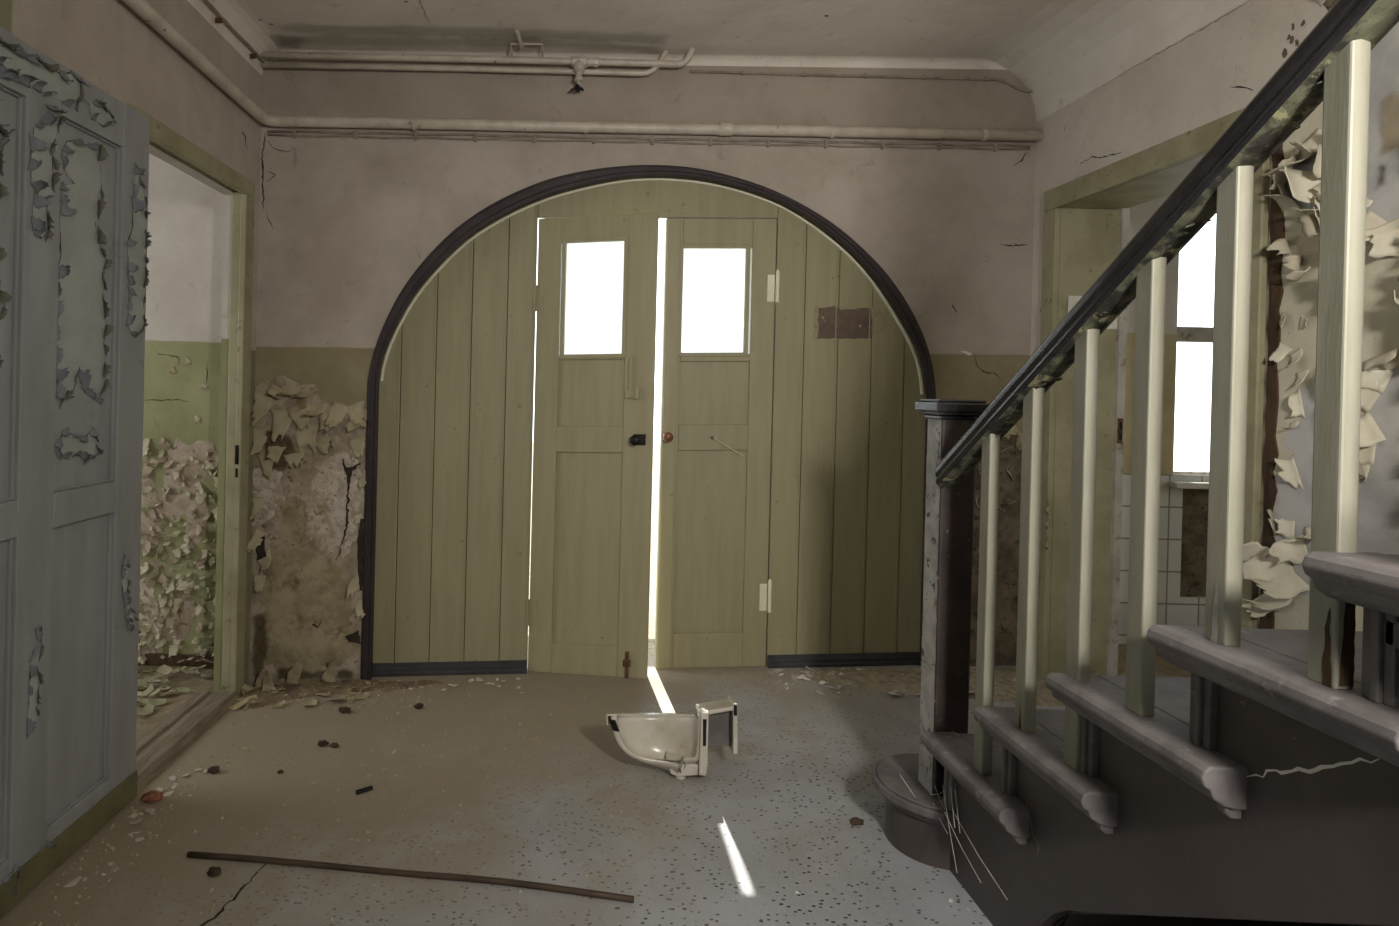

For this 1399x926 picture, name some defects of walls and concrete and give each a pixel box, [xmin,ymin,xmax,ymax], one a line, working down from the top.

peeling [0,36,152,409]
peeling [1260,125,1322,238]
peeling [1266,239,1318,281]
peeling [1282,19,1305,58]
peeling [1365,22,1399,258]
peeling [121,437,218,665]
peeling [247,375,367,682]
crack [336,459,361,559]
peeling [1242,312,1315,618]
peeling [1357,348,1399,554]
crack [1247,757,1379,778]
crack [200,864,266,926]